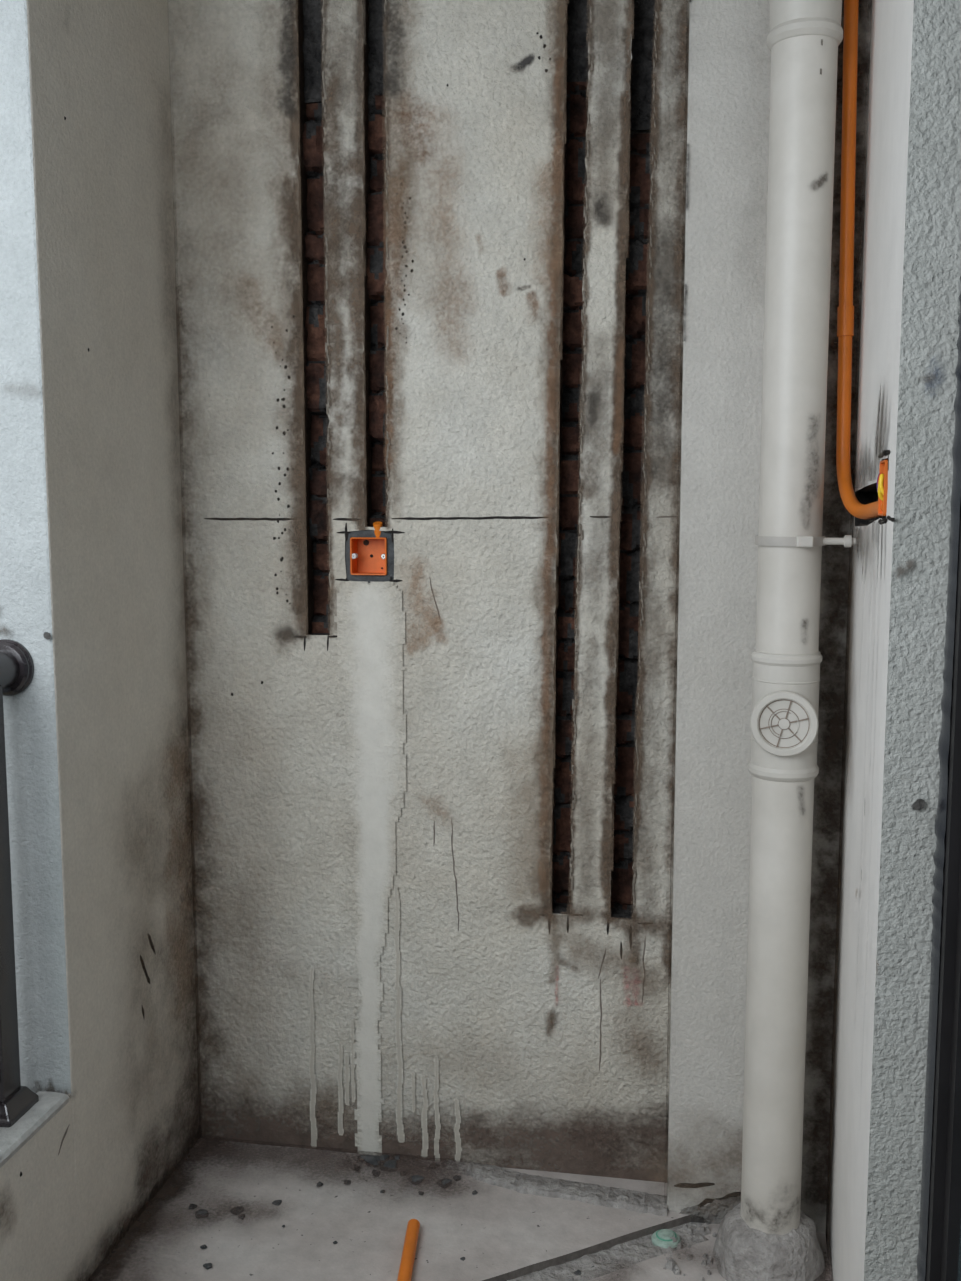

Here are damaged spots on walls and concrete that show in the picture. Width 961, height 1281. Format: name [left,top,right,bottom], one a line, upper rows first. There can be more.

damp [277,628,298,640]
damp [77,884,669,1281]
damp [815,1256,833,1281]